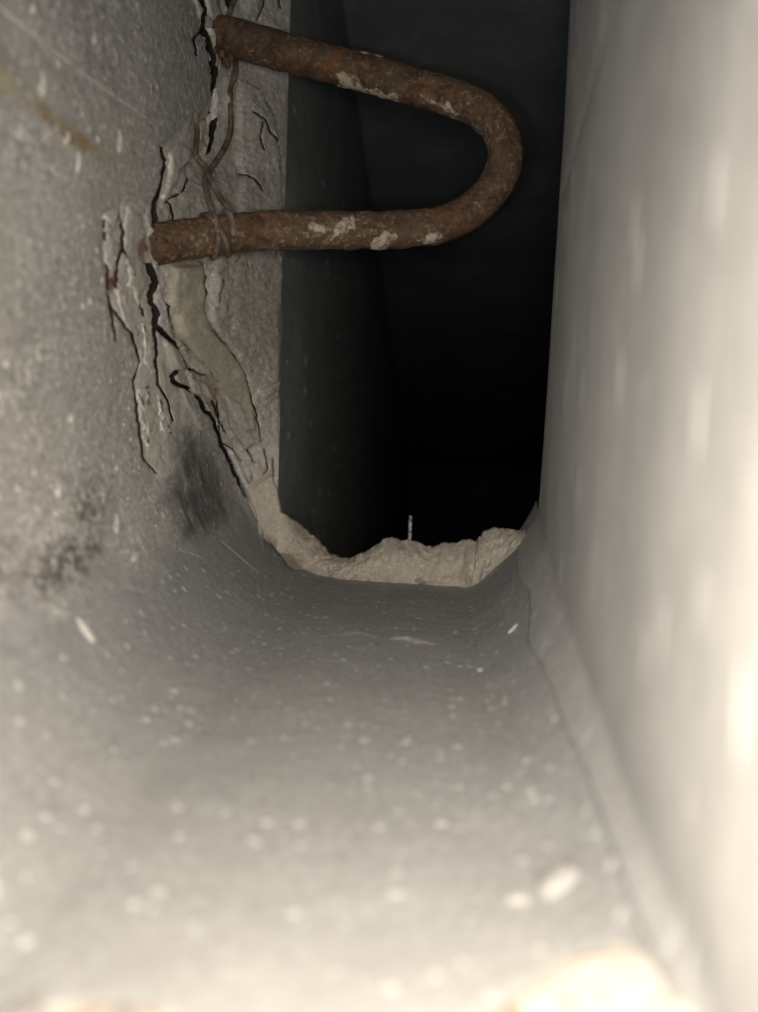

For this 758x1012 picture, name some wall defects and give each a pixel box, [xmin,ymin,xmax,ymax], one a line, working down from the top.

crack [151,146,188,229]
spalling [101,0,291,487]
crack [192,0,231,155]
crack [238,173,263,191]
crack [253,111,278,150]
crack [102,216,274,497]